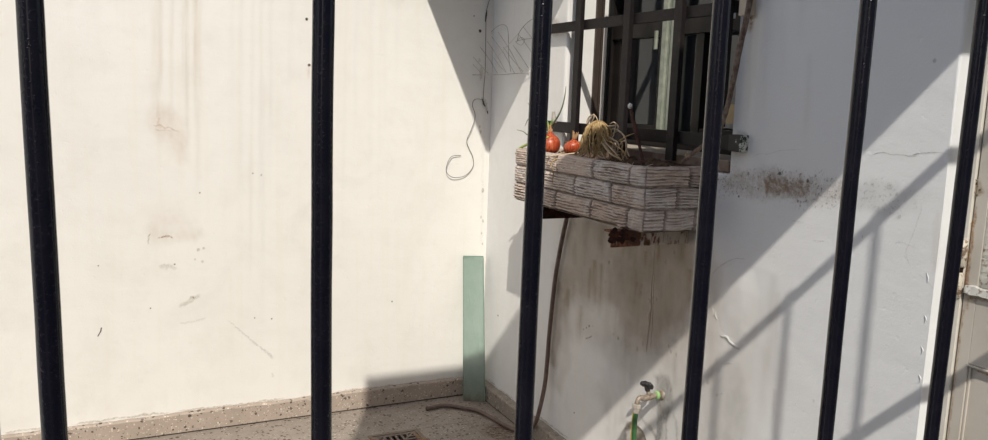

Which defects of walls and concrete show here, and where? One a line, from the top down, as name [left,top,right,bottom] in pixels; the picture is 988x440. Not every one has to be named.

corrosion [608,227,636,244]